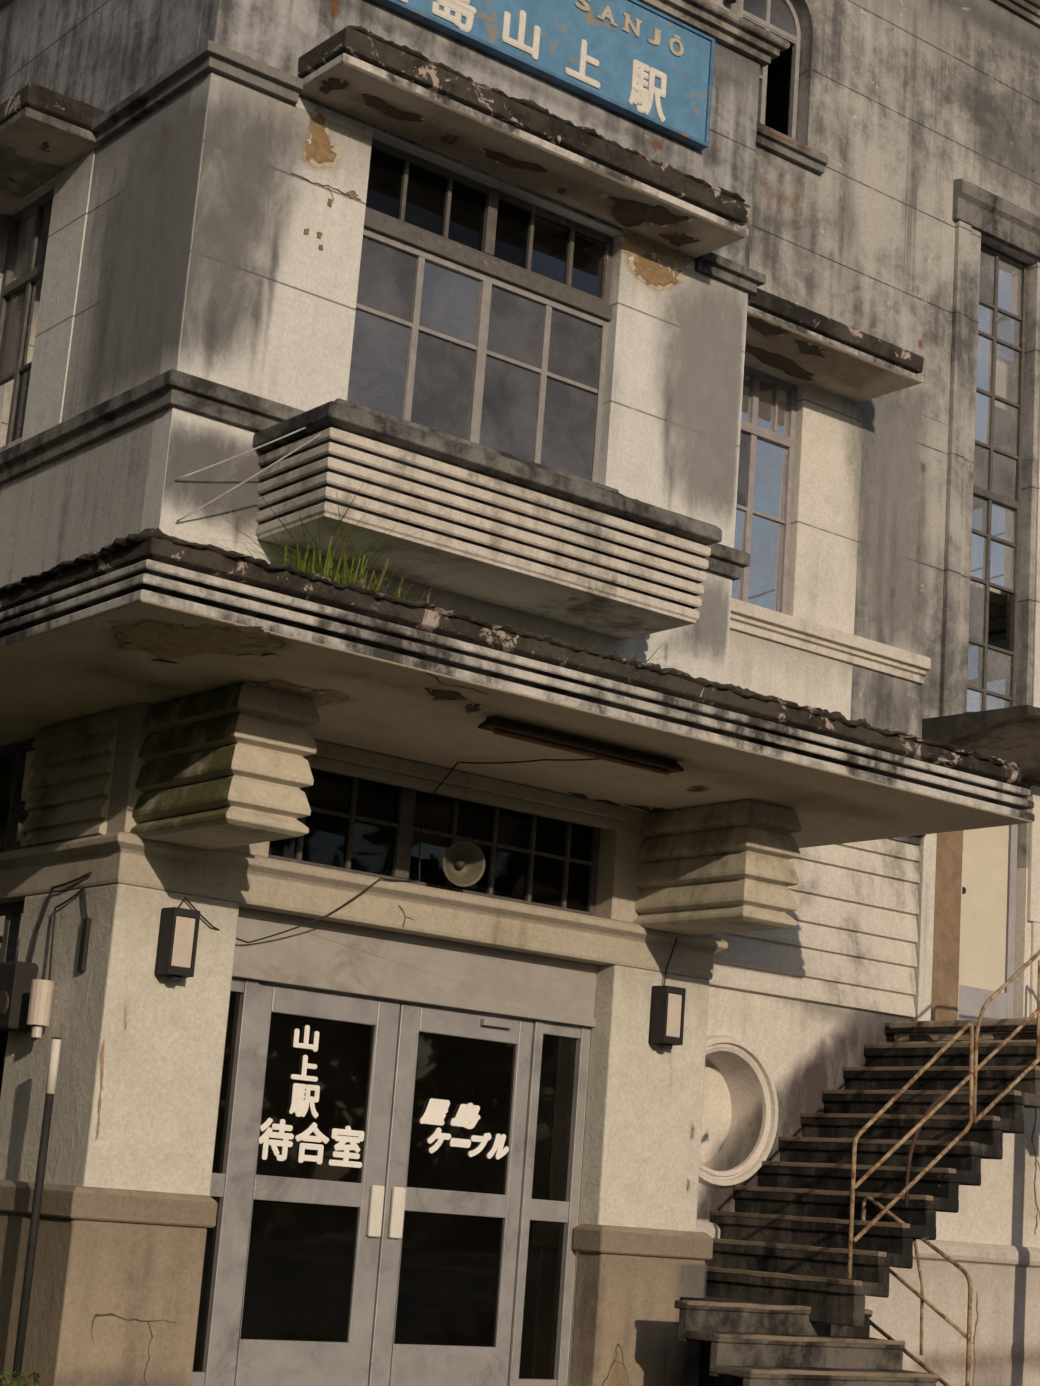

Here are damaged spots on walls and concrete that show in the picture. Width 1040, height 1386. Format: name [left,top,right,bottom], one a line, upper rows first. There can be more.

spalling [302,77,426,169]
peeling [479,147,546,172]
water stain [87,102,291,400]
peeling [600,193,699,291]
peeling [745,314,825,383]
peeling [106,620,285,665]
water stain [697,1012,913,1220]
crack [1031,1108,1040,1235]
crack [91,1313,177,1386]
crack [959,1296,978,1386]